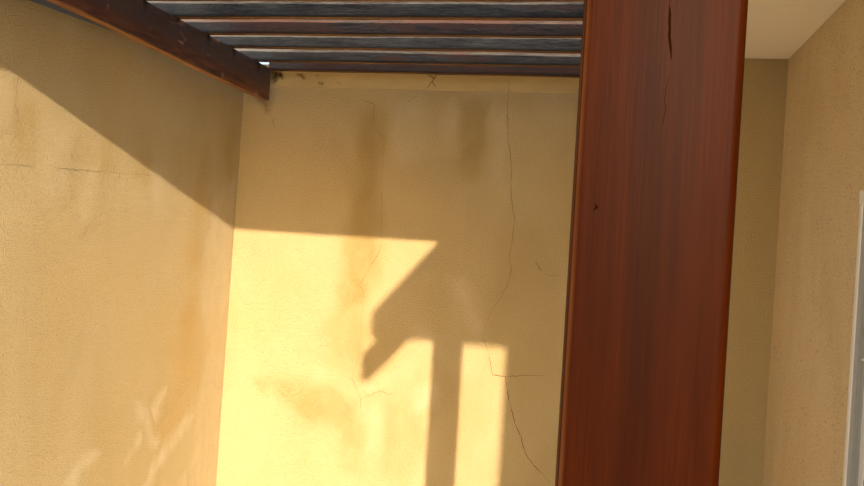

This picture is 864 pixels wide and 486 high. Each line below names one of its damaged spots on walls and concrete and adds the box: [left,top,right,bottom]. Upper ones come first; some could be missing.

water stain [438,268,493,347]
water stain [276,316,453,465]